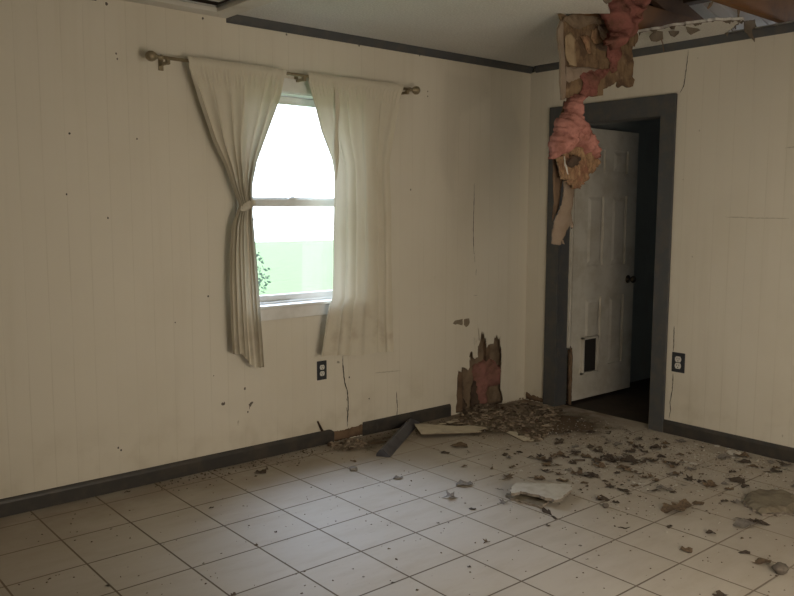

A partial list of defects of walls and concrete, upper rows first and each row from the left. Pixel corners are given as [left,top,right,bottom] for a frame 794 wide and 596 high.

crack [341,359,349,426]
spalling [456,333,503,413]